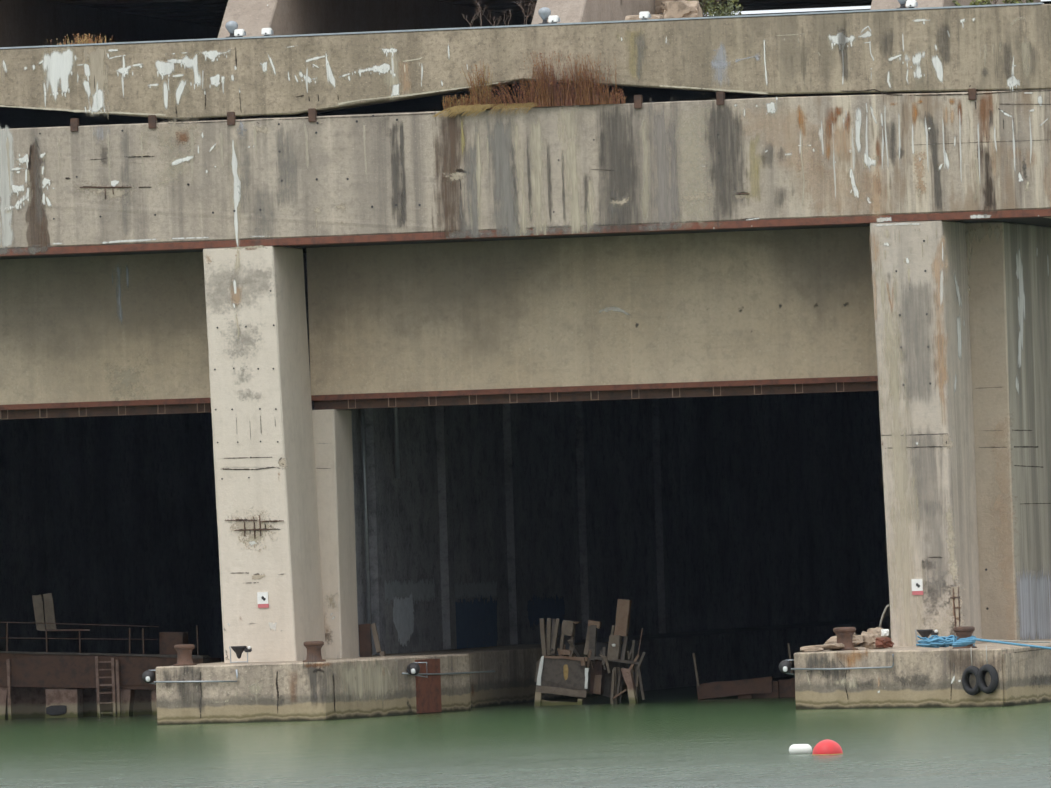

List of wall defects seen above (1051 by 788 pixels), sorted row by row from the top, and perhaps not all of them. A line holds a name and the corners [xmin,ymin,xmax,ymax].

leakage [828,26,874,84]
leakage [0,130,62,255]
leakage [435,110,678,239]
leakage [660,33,805,216]
rust [826,107,850,153]
leakage [765,103,962,209]
leakage [877,217,920,231]
leakage [965,125,1000,272]
leakage [1005,46,1047,191]
leakage [1016,249,1025,394]
spalling [225,515,284,552]